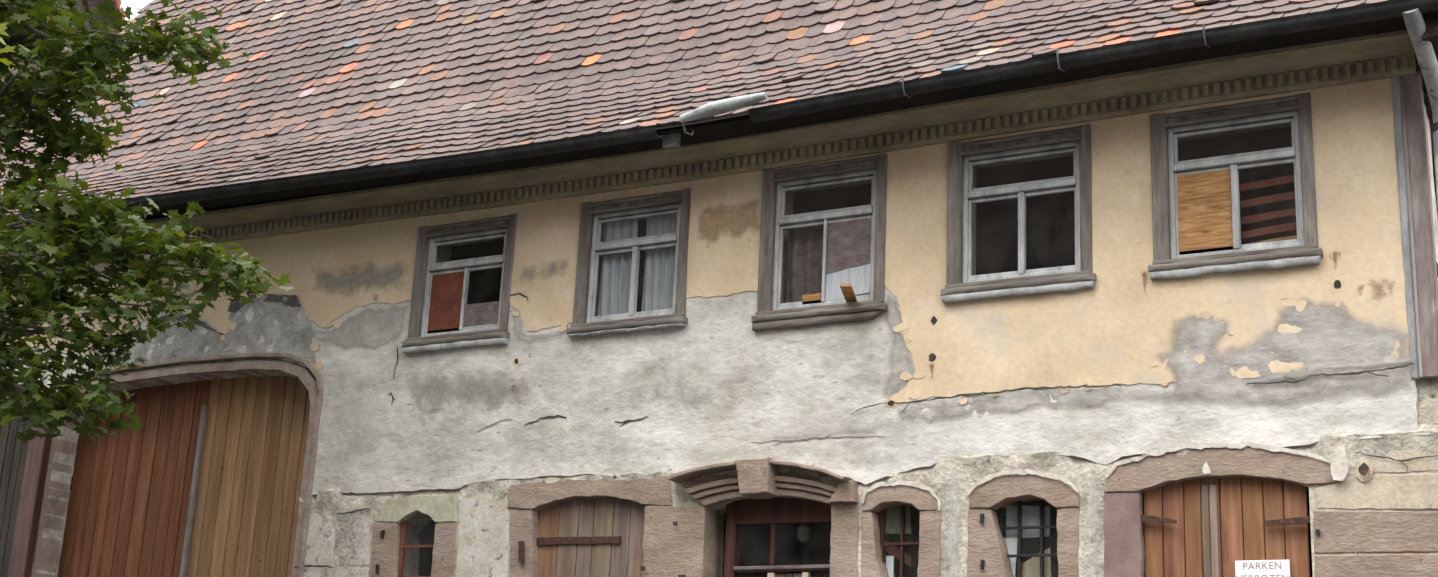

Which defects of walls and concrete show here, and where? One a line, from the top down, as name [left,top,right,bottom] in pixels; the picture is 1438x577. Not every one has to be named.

flaking render [101,289,406,376]
flaking render [884,277,1408,422]
crack [756,385,1121,445]
spalling [1330,445,1374,482]